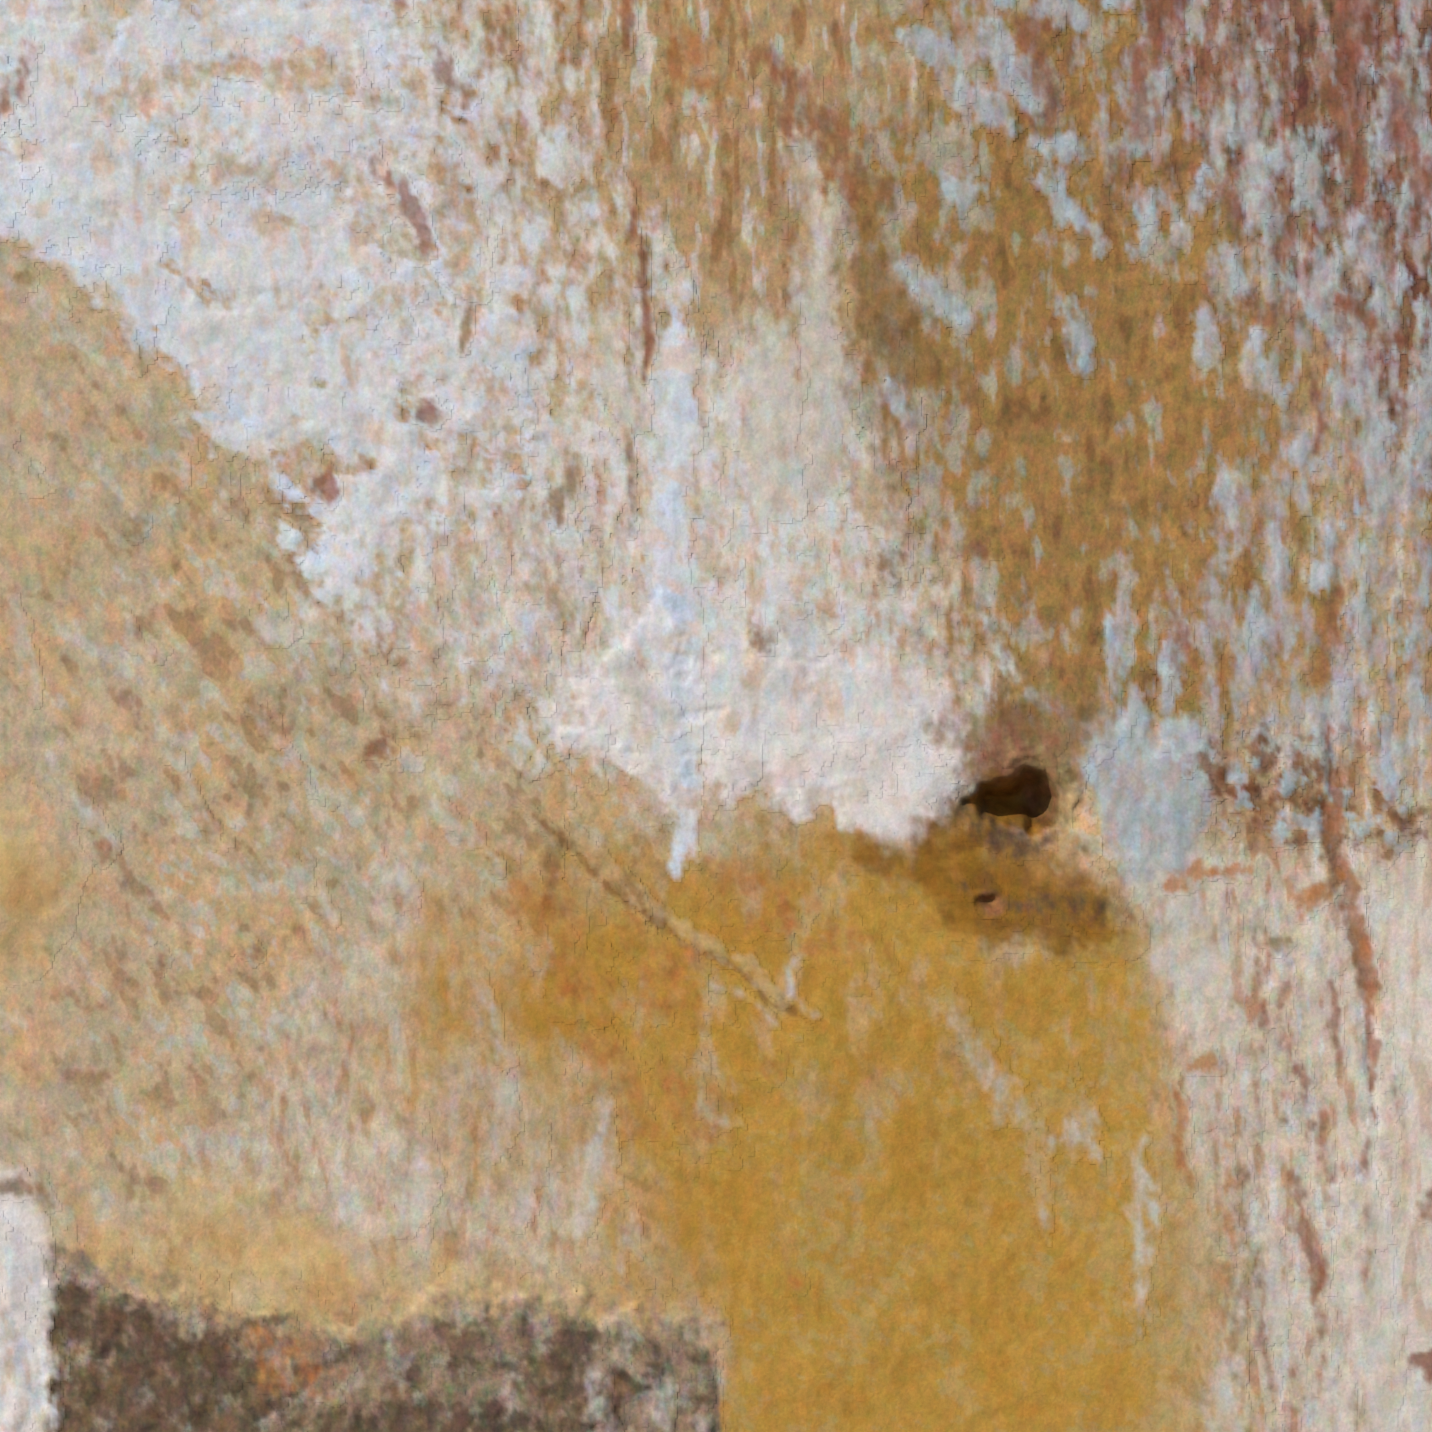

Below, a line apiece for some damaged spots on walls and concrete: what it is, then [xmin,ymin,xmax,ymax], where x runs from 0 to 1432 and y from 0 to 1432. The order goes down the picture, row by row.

peeling [0,0,1028,834]
crack [510,797,813,1043]
peeling [888,0,1432,1134]
water stain [50,1278,716,1432]